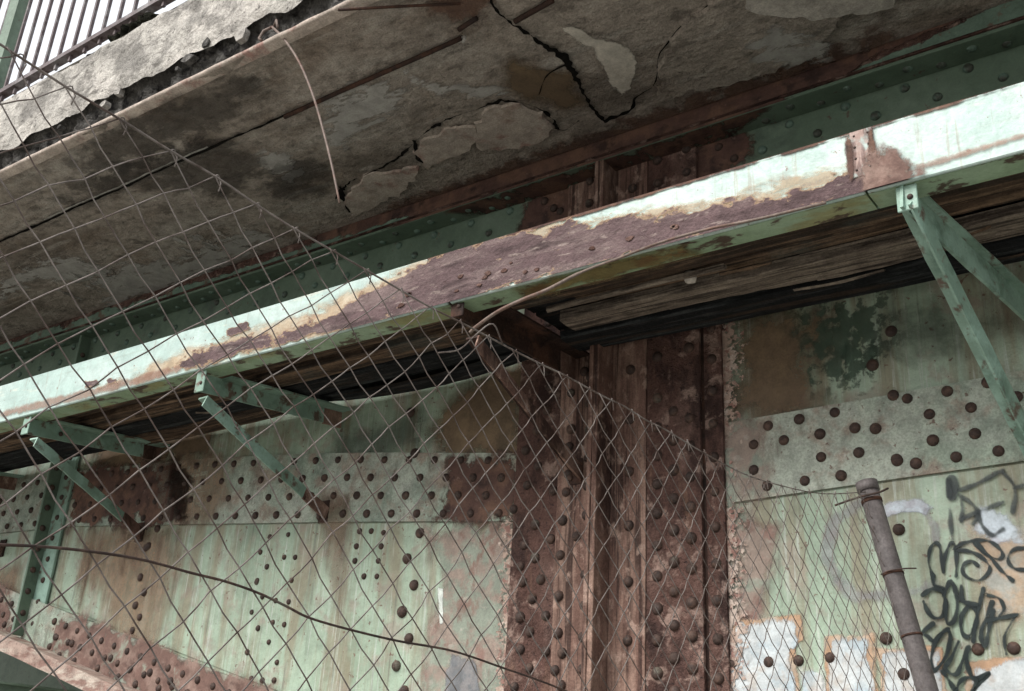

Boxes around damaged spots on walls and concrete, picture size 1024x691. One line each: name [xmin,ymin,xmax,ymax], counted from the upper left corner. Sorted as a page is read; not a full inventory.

water stain [0,230,281,306]
spalling [0,0,461,170]
spalling [344,100,554,216]
rust [0,86,1024,416]
crack [335,0,714,213]
rust [386,27,896,213]
rust [0,567,17,633]
rust [50,455,274,691]